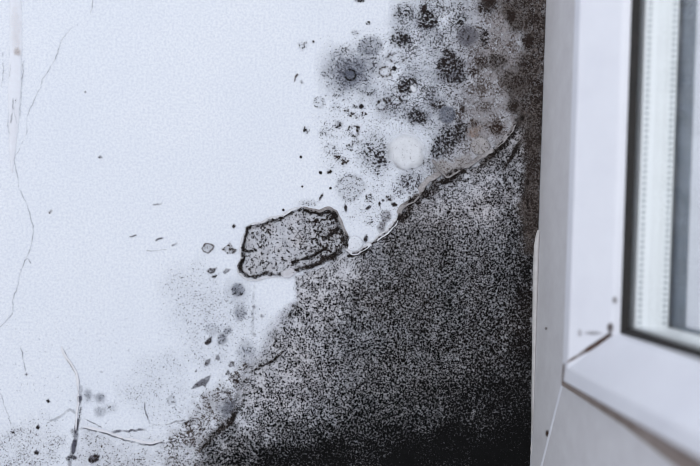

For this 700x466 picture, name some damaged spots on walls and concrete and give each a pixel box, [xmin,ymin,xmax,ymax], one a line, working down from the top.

water stain [302,0,546,253]
water stain [160,263,262,368]
flaking render [84,114,539,466]
crack [61,346,82,461]
water stain [79,431,163,466]